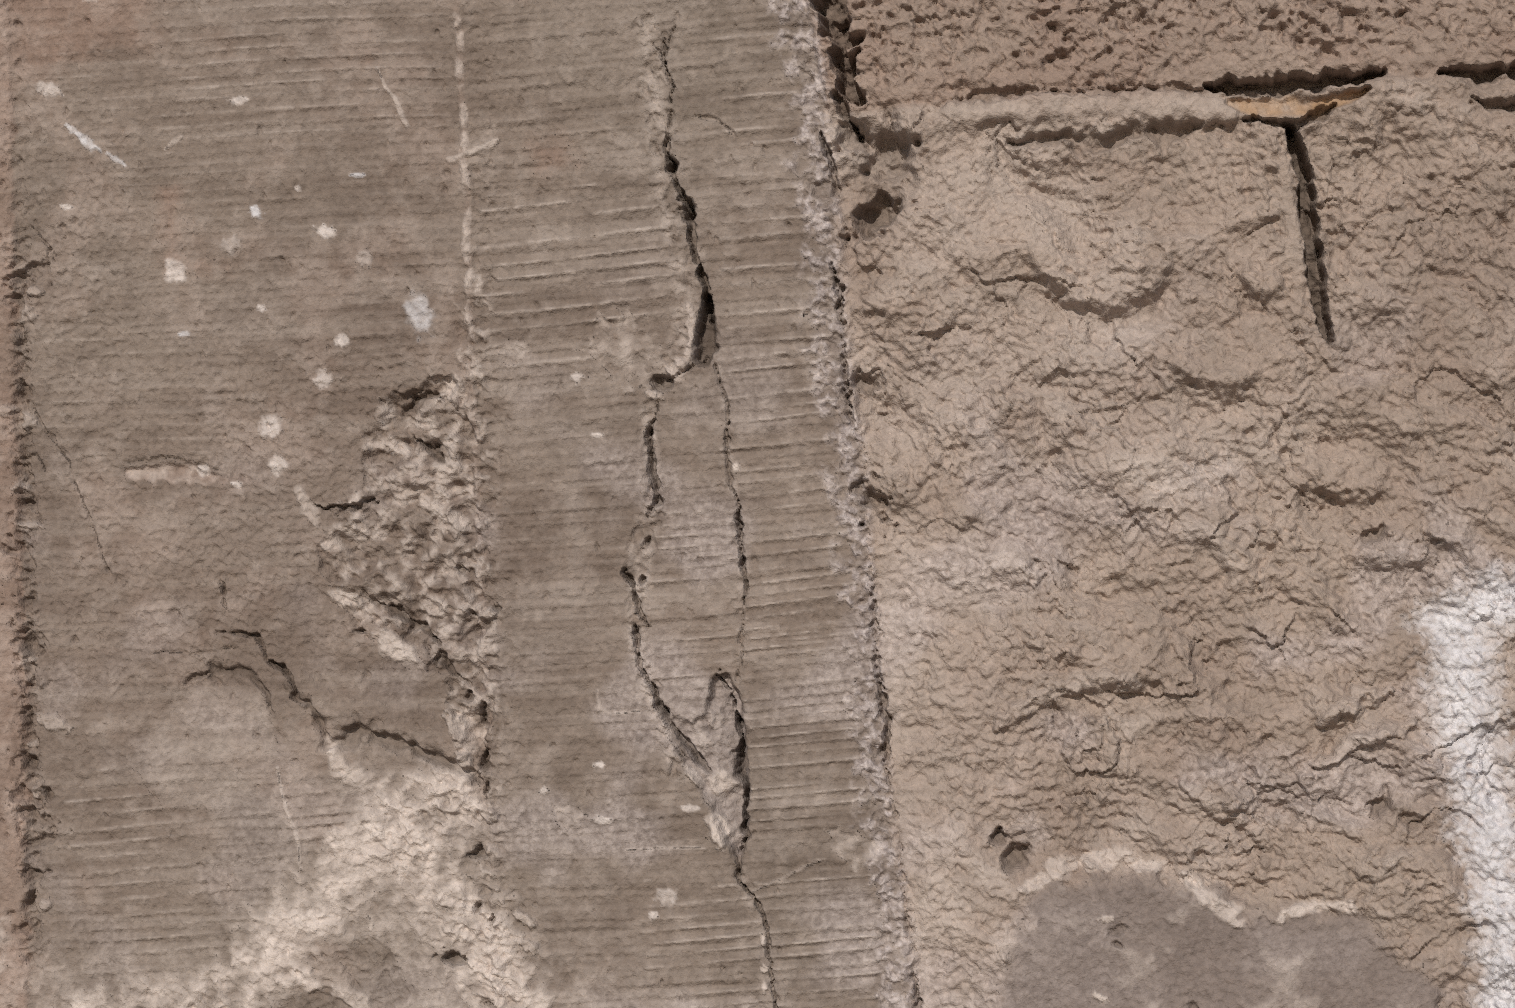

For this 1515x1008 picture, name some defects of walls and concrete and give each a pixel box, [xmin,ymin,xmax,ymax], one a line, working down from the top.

crack [652,28,713,299]
crack [1282,121,1333,345]
crack [1437,59,1515,112]
crack [195,581,484,787]
spalling [318,376,502,824]
crack [622,567,684,755]
crack [644,401,664,519]
crack [686,365,749,681]
crack [734,856,778,1008]